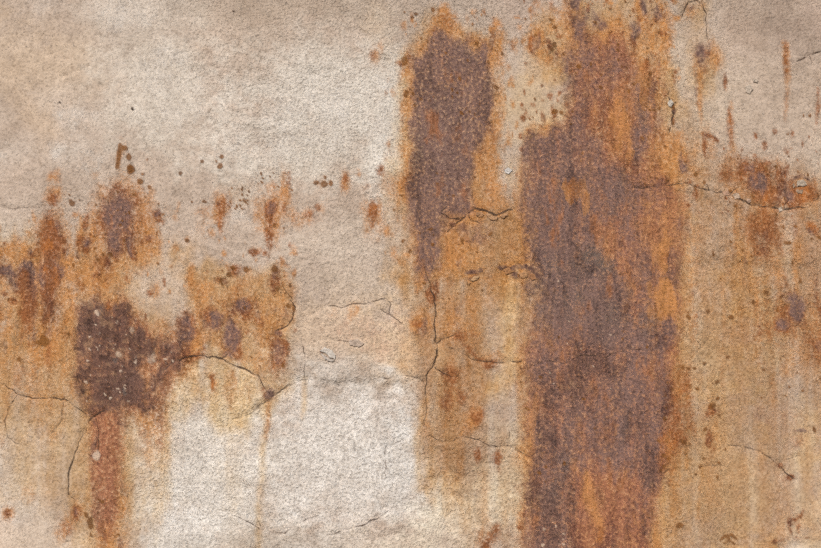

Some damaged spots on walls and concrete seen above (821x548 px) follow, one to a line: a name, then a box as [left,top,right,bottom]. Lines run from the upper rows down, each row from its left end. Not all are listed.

corrosion [696,45,719,80]
corrosion [721,154,819,263]
corrosion [0,143,295,548]
crack [163,348,339,418]
crack [411,274,634,447]
corrosion [395,0,714,548]
corrosion [774,296,804,332]
crack [4,386,106,498]